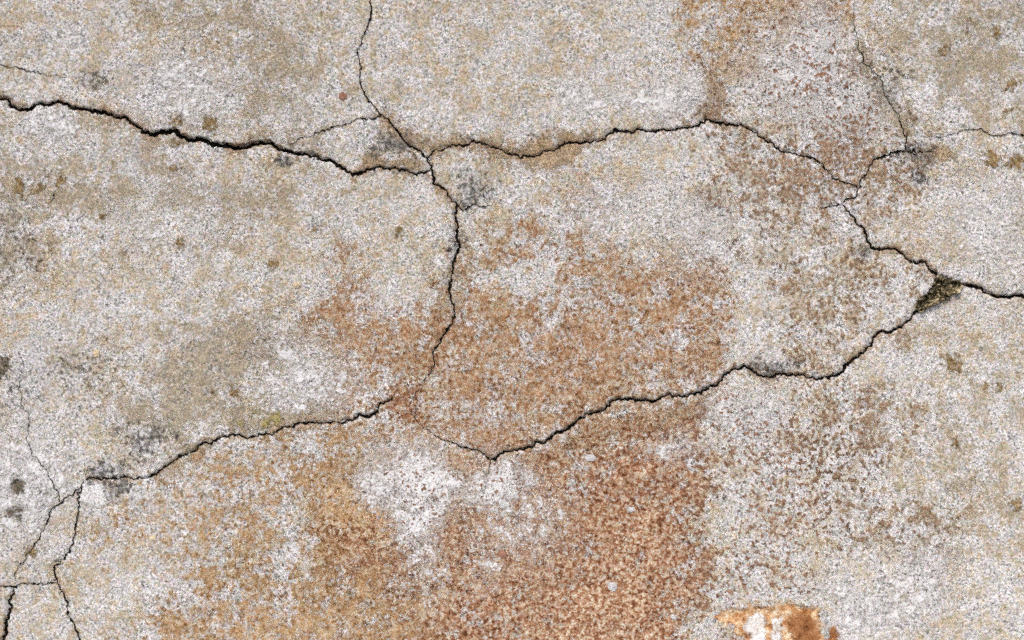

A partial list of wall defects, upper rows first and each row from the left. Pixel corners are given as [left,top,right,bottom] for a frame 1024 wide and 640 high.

corrosion [94,501,155,541]
crack [0,356,393,640]
crack [0,1,1024,471]
corrosion [150,0,965,640]